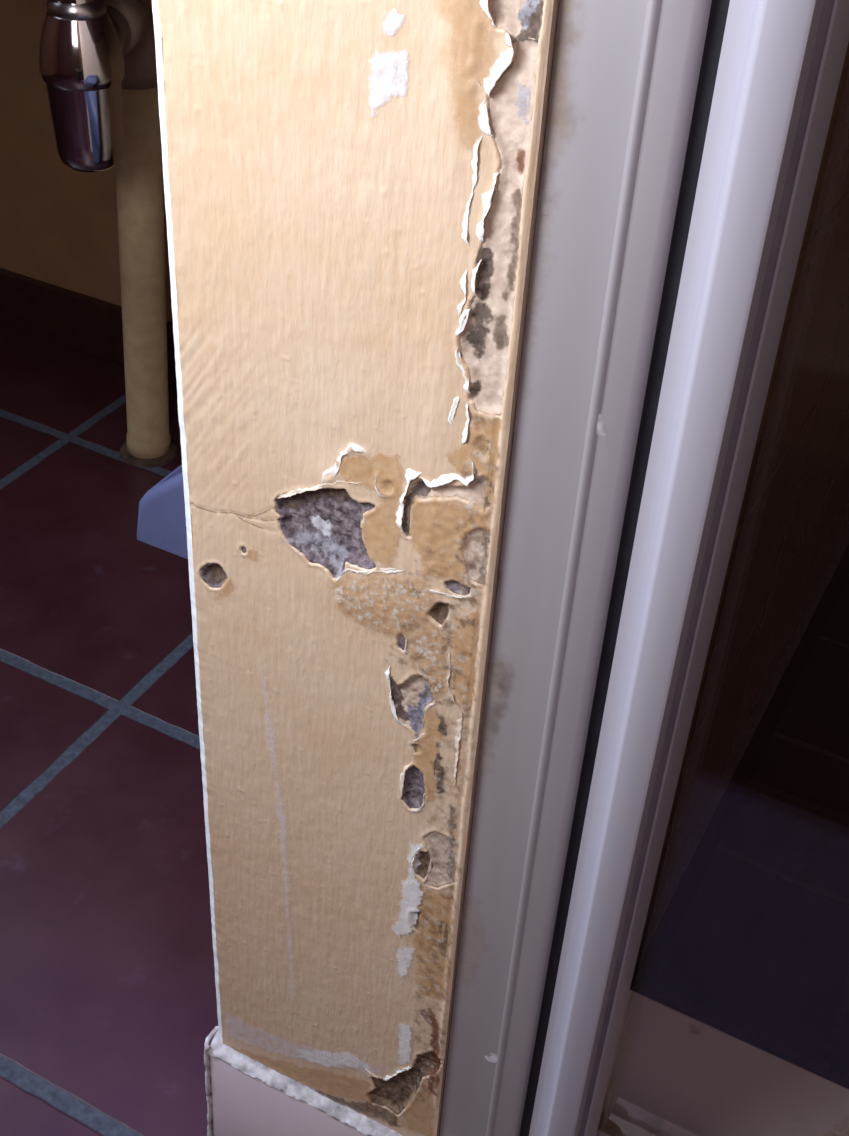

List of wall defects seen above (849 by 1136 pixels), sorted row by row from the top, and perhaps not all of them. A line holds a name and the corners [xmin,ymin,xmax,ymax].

peeling [396,0,544,536]
flaking render [201,563,228,588]
crack [196,506,268,528]
flaking render [276,443,403,582]
flaking render [398,633,408,654]
peeling [428,528,490,625]
flaking render [385,666,435,813]
peeling [447,647,463,786]
peeling [392,806,456,984]
flaking render [365,1052,442,1115]